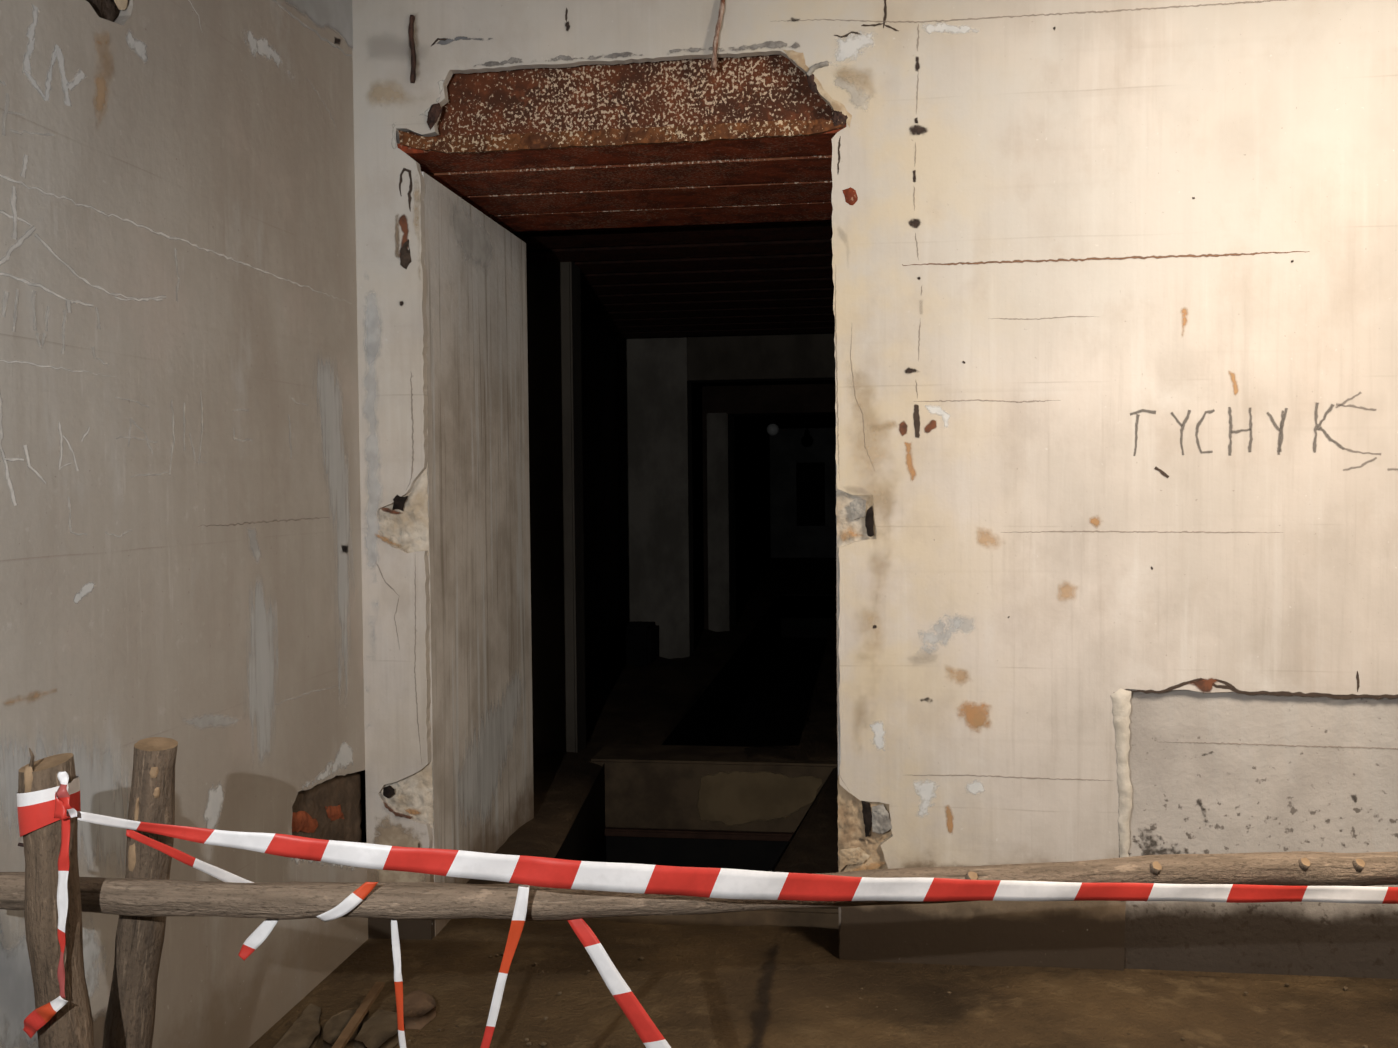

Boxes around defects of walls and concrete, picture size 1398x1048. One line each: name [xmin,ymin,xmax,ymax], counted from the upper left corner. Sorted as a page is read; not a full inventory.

spalling [86,0,128,22]
rust [806,72,818,94]
rust [399,119,844,173]
rust [395,168,412,269]
rust [842,187,858,205]
spalling [377,462,429,556]
spalling [836,485,877,552]
crack [1113,671,1398,700]
rust [961,704,989,728]
spalling [292,742,434,848]
spalling [837,775,892,872]
mould [1140,829,1180,855]